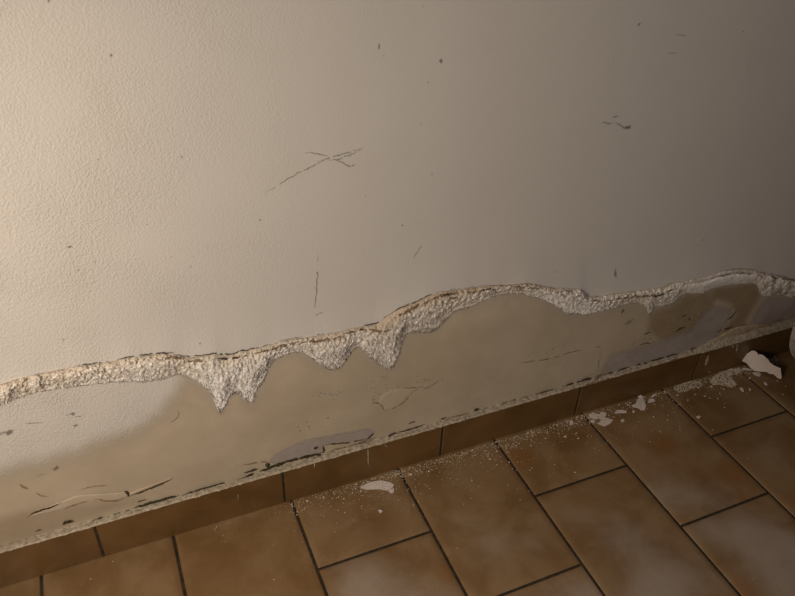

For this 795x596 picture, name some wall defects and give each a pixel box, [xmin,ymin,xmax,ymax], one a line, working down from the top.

crack [268,148,361,191]
peeling [0,268,795,414]
damp [0,283,795,546]
peeling [588,412,625,426]
peeling [241,429,374,473]
peeling [29,478,172,517]
peeling [360,480,394,493]